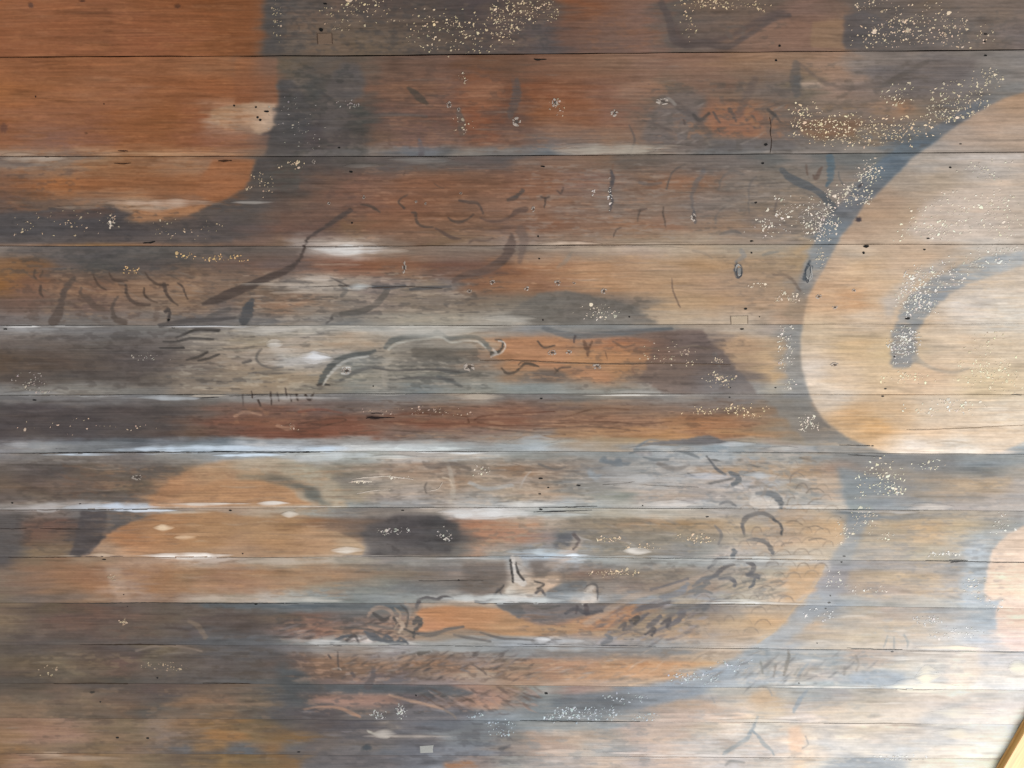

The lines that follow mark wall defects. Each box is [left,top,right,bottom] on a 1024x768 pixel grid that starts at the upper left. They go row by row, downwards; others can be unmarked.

leakage [3,471,832,566]